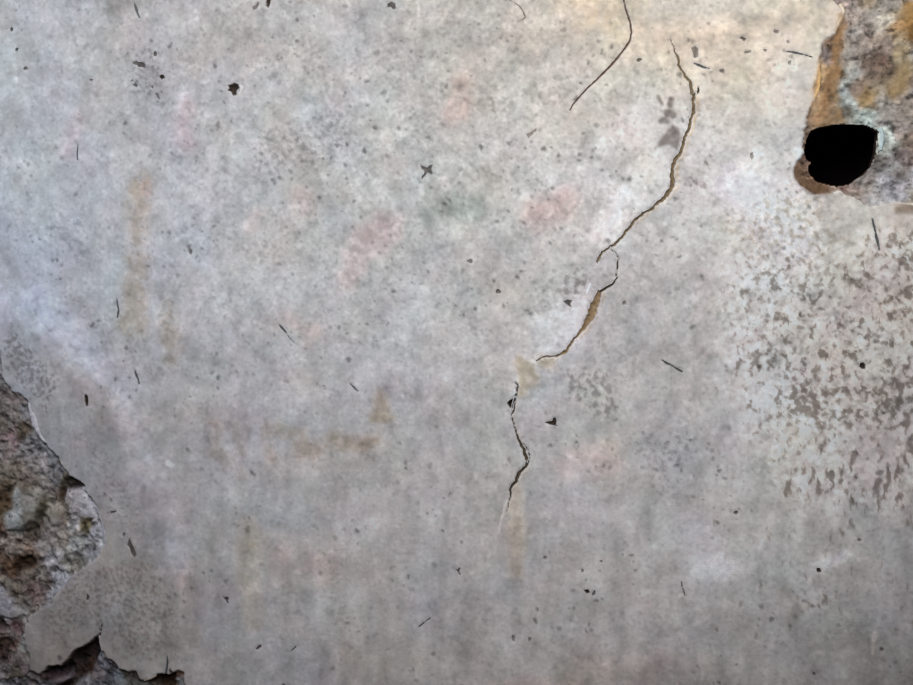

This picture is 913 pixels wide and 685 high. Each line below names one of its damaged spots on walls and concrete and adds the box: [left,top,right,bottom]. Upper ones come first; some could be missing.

crack [569,0,633,110]
crack [536,38,700,362]
spalling [793,0,913,208]
spalling [0,351,185,685]
crack [498,382,531,533]
peeling [724,227,913,542]